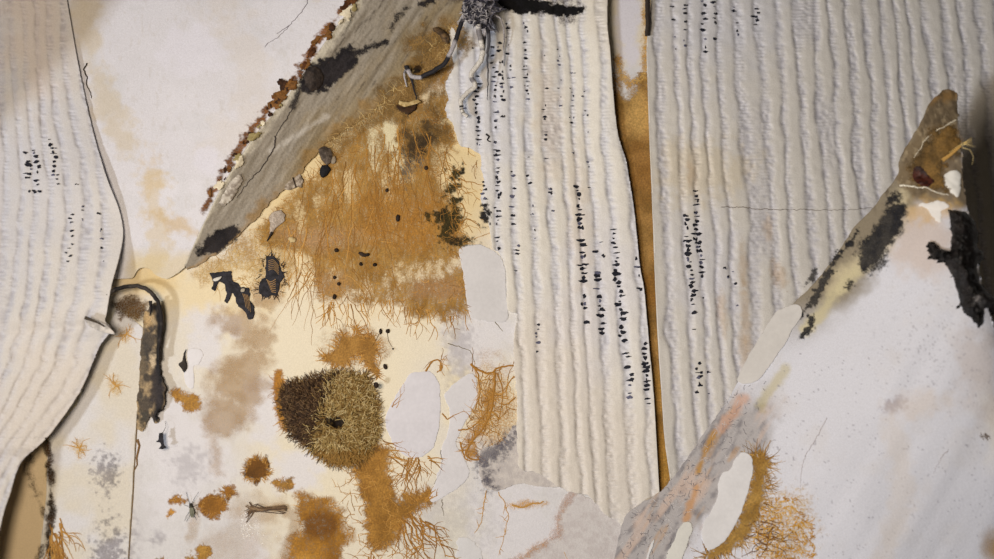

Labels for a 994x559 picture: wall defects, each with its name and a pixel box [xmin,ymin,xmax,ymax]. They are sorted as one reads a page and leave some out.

corrosion [201,0,358,211]
peeling [210,210,288,320]
leakage [168,0,532,436]
peeling [459,244,509,323]
leakage [573,0,817,559]
leakage [800,192,908,339]
peeling [913,166,961,222]
leakage [926,209,994,328]
peeling [385,371,478,502]
leakage [442,348,515,463]
leakage [166,441,461,559]
peeling [667,452,753,559]